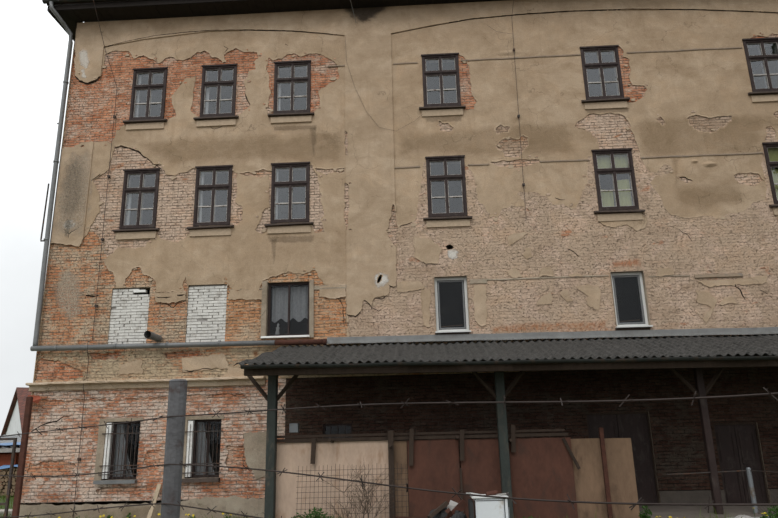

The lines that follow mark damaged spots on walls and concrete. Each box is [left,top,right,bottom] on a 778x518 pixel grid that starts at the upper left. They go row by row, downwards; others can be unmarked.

flaking render [458,55,478,110]
flaking render [618,45,648,103]
flaking render [35,47,340,381]
flaking render [221,110,778,349]